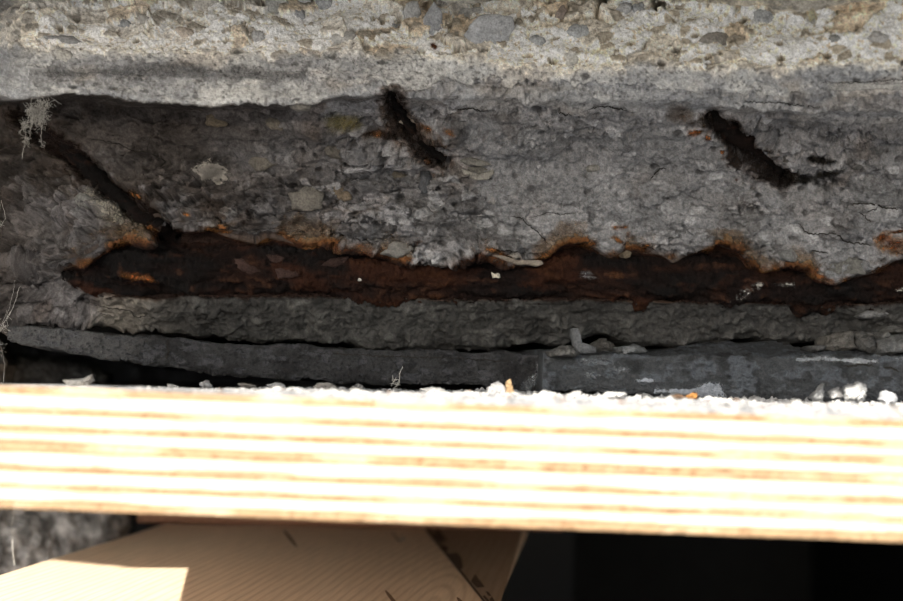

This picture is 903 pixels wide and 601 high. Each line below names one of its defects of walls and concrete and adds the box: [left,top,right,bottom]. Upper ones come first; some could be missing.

corrosion [2,106,675,272]
spalling [0,0,903,336]
corrosion [688,229,903,286]
corrosion [100,292,351,301]
crack [88,305,224,366]
crack [840,363,899,372]